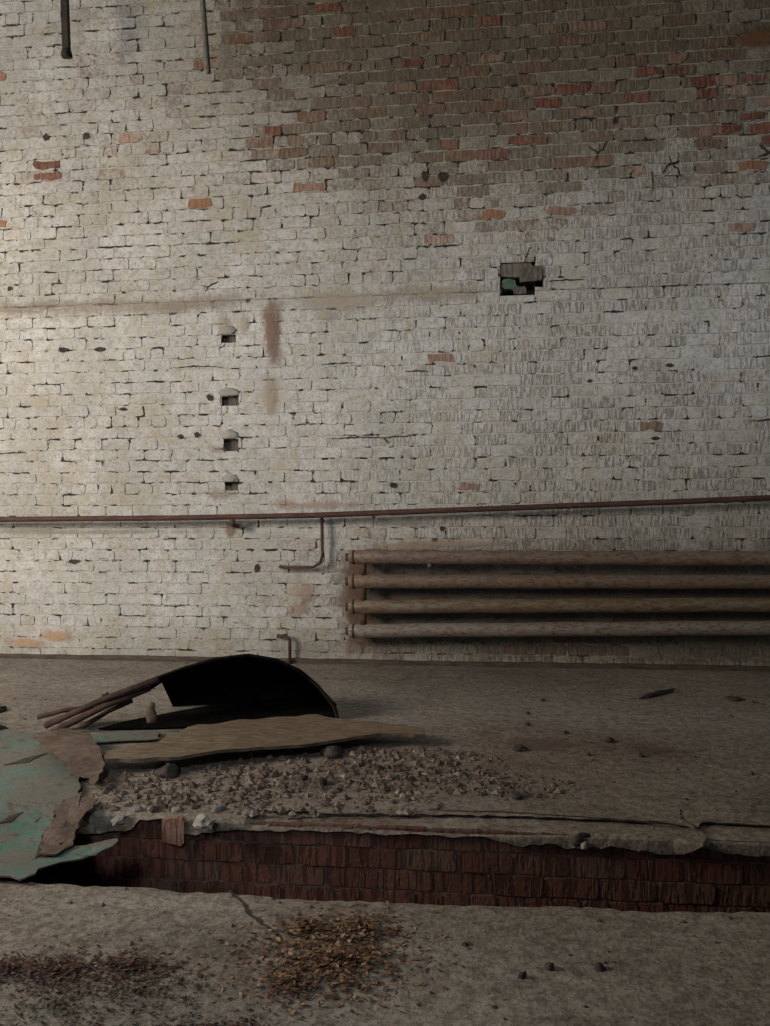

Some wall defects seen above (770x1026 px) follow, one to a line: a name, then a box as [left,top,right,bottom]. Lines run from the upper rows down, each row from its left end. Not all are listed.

peeling [501,82,601,131]
peeling [636,51,770,149]
flaking render [33,161,61,181]
peeling [264,126,334,167]
peeling [292,182,327,192]
spalling [418,171,448,200]
rust [263,303,279,361]
spalling [0,819,770,913]
crack [229,890,287,943]